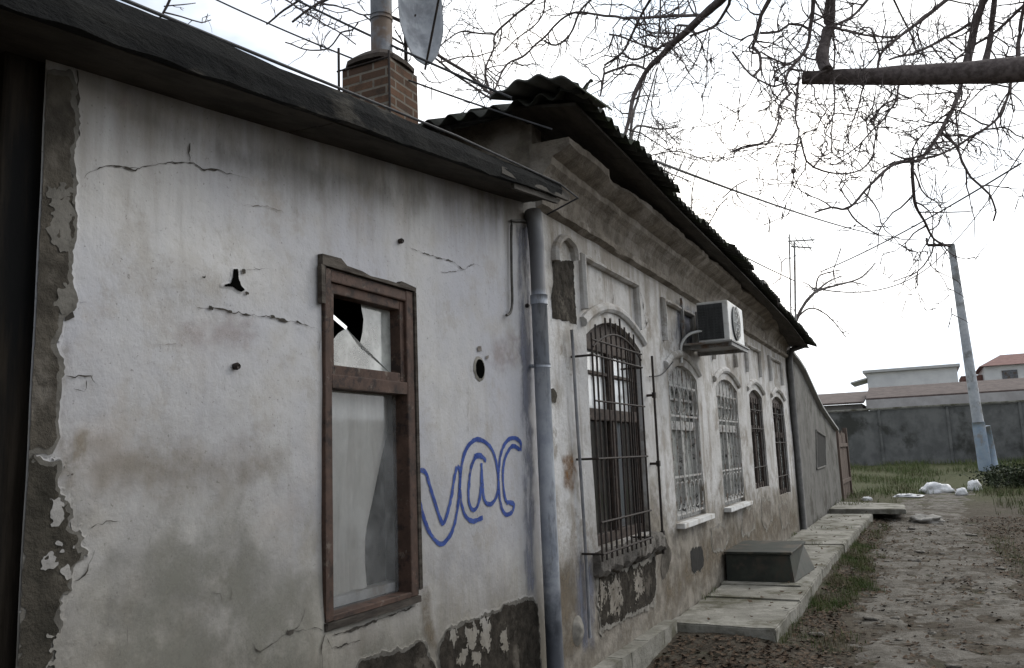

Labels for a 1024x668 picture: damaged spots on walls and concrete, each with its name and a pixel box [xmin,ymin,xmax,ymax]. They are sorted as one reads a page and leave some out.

crack [73,70,81,136]
crack [71,144,246,178]
crack [411,248,483,273]
crack [51,312,74,344]
crack [195,305,320,348]
spalling [17,66,89,668]
spalling [594,536,672,640]
peeling [354,600,541,668]